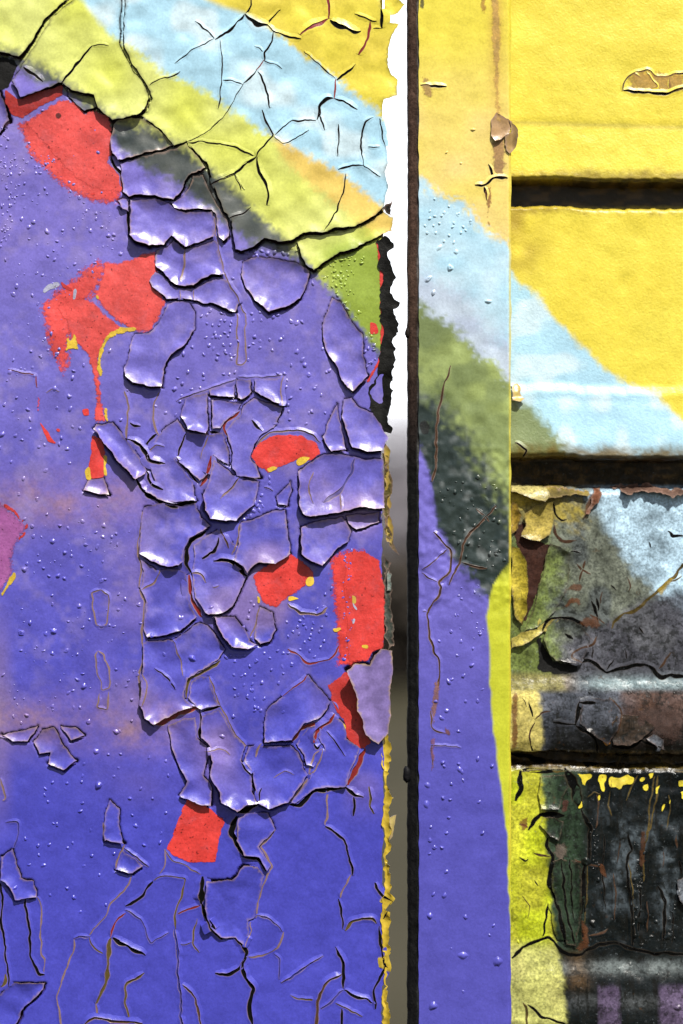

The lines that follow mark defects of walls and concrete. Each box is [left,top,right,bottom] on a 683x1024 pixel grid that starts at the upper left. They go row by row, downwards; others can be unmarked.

corrosion [481,0,501,121]
corrosion [492,138,505,173]
peeling [491,113,518,154]
crack [429,365,453,482]
crack [0,0,395,1024]
peeling [0,0,405,1024]
crack [421,504,497,767]
peeling [511,482,683,674]
peeling [580,698,665,750]
peeling [538,773,659,841]